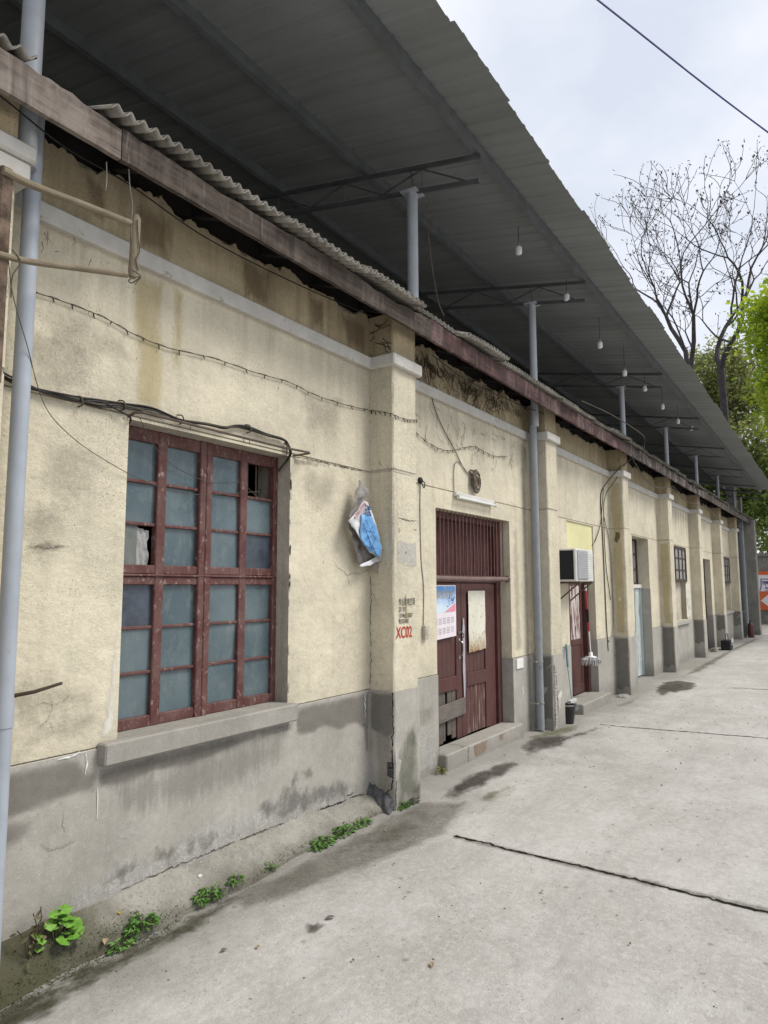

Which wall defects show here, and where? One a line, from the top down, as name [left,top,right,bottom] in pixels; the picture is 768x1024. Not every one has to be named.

water stain [76,787,351,906]
crack [455,835,768,913]